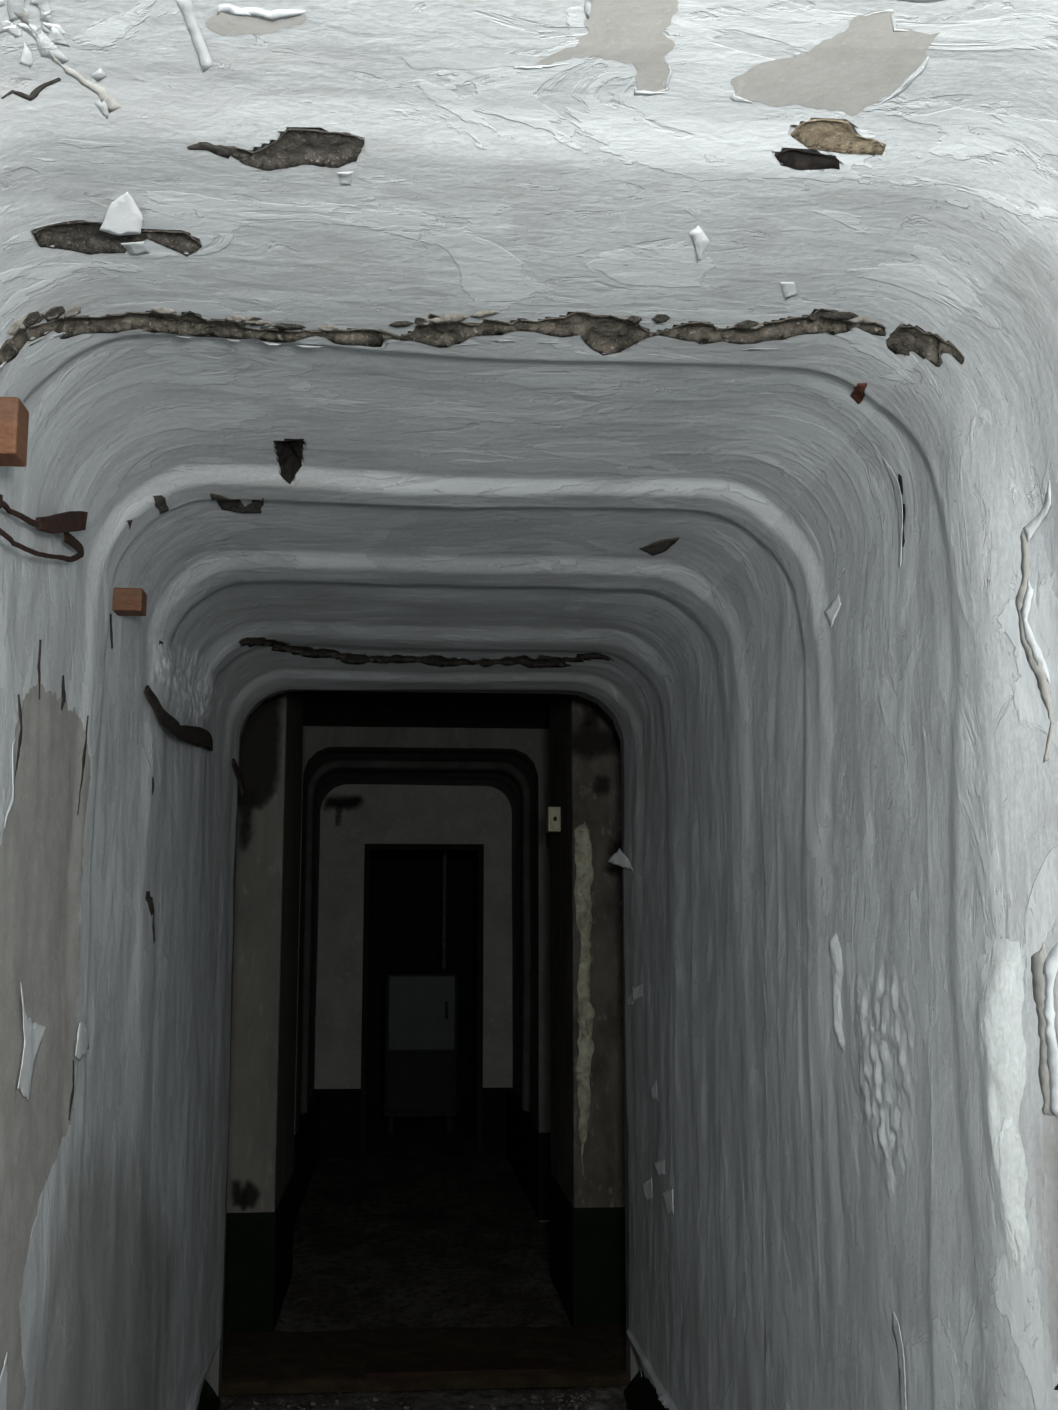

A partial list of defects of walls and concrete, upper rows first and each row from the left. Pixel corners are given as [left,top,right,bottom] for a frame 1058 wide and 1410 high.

peeling [0,0,121,119]
peeling [402,0,679,96]
peeling [729,0,943,170]
spalling [187,128,365,185]
spalling [32,191,202,257]
crack [0,305,965,373]
peeling [1015,480,1054,763]
peeling [1031,942,1058,1117]
peeling [628,1367,669,1410]
peeling [892,1311,907,1410]